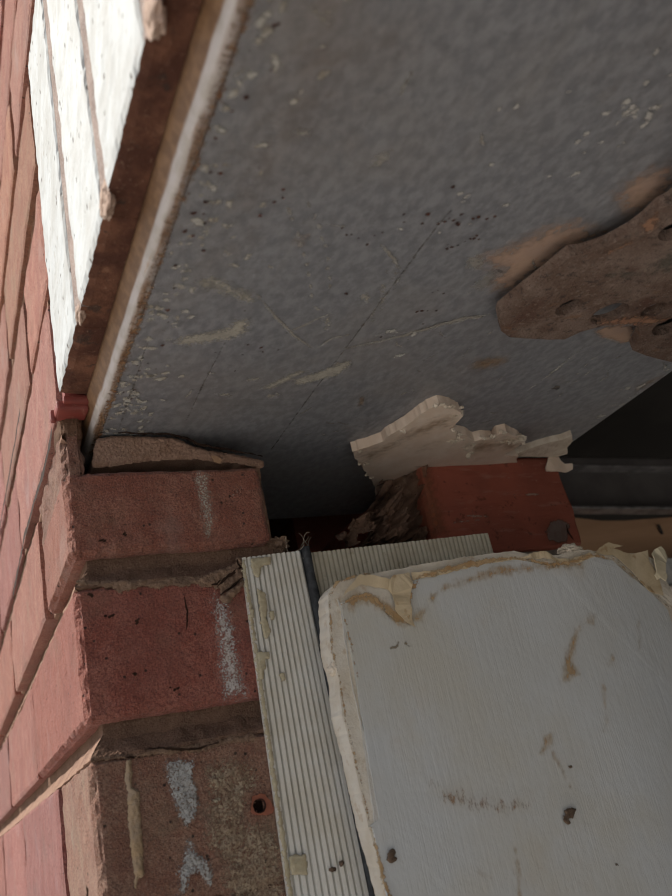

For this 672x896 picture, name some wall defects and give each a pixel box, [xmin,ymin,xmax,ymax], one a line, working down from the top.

rust [488,224,606,289]
rust [597,315,667,343]
peeling [86,432,264,475]
spalling [198,556,244,604]
leakage [211,593,247,701]
crack [126,741,219,758]